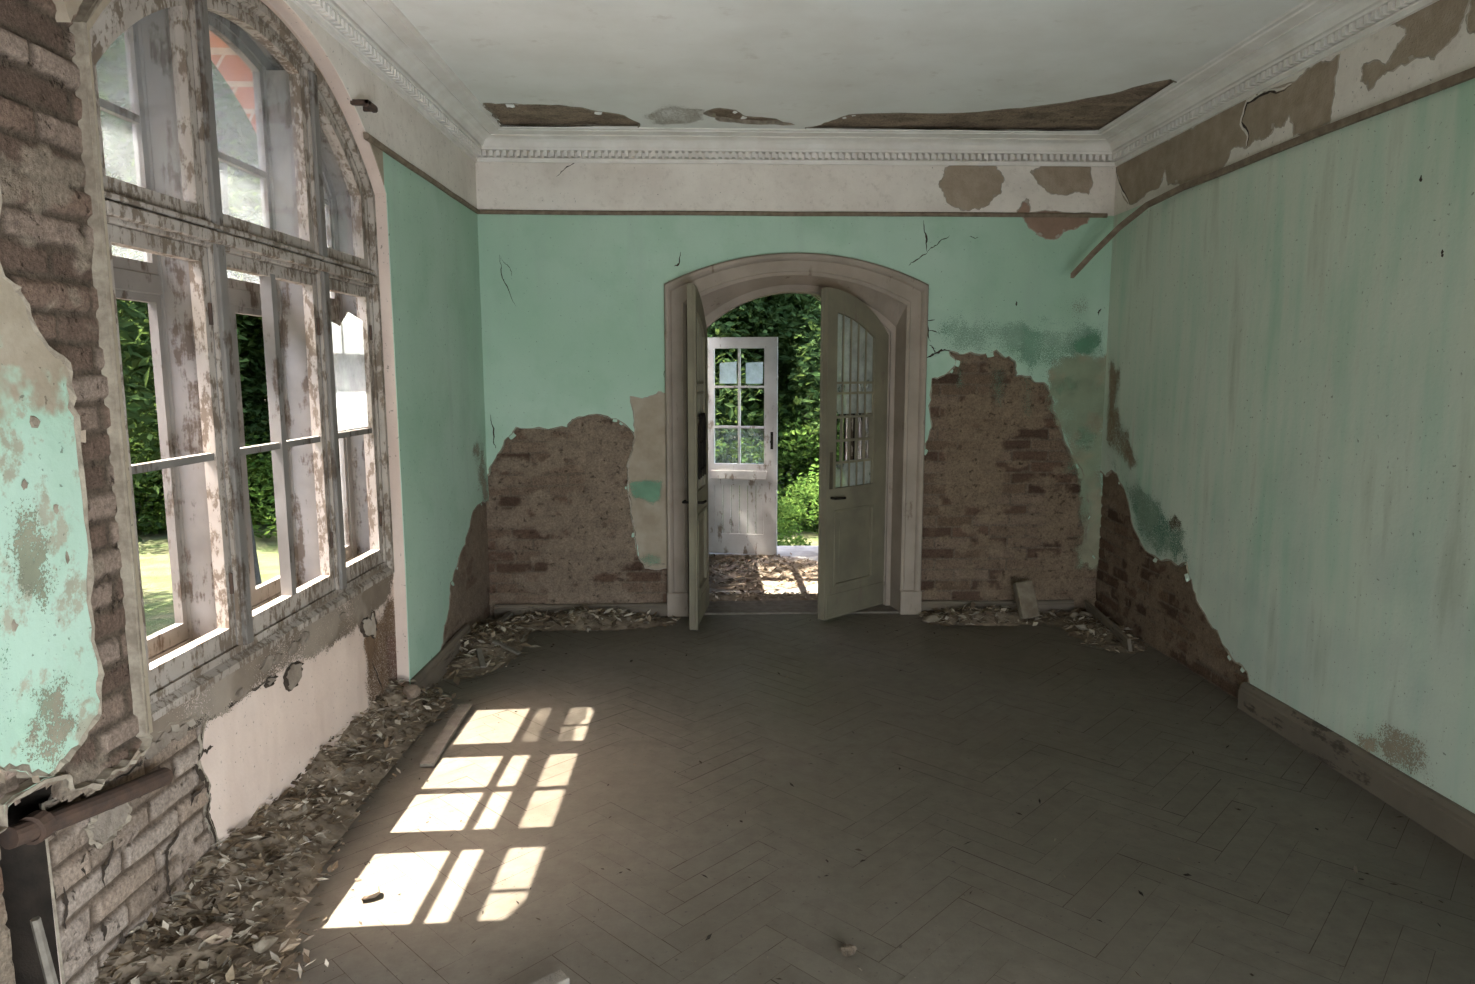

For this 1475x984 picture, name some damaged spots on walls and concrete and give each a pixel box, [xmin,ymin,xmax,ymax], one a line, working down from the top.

spalling [483,103,640,128]
spalling [703,79,1177,131]
peeling [938,165,1005,211]
peeling [1016,166,1093,241]
peeling [1116,54,1340,205]
peeling [1360,0,1475,92]
spalling [0,0,394,984]
spalling [440,391,667,650]
spalling [921,350,1250,700]
crack [116,681,266,903]